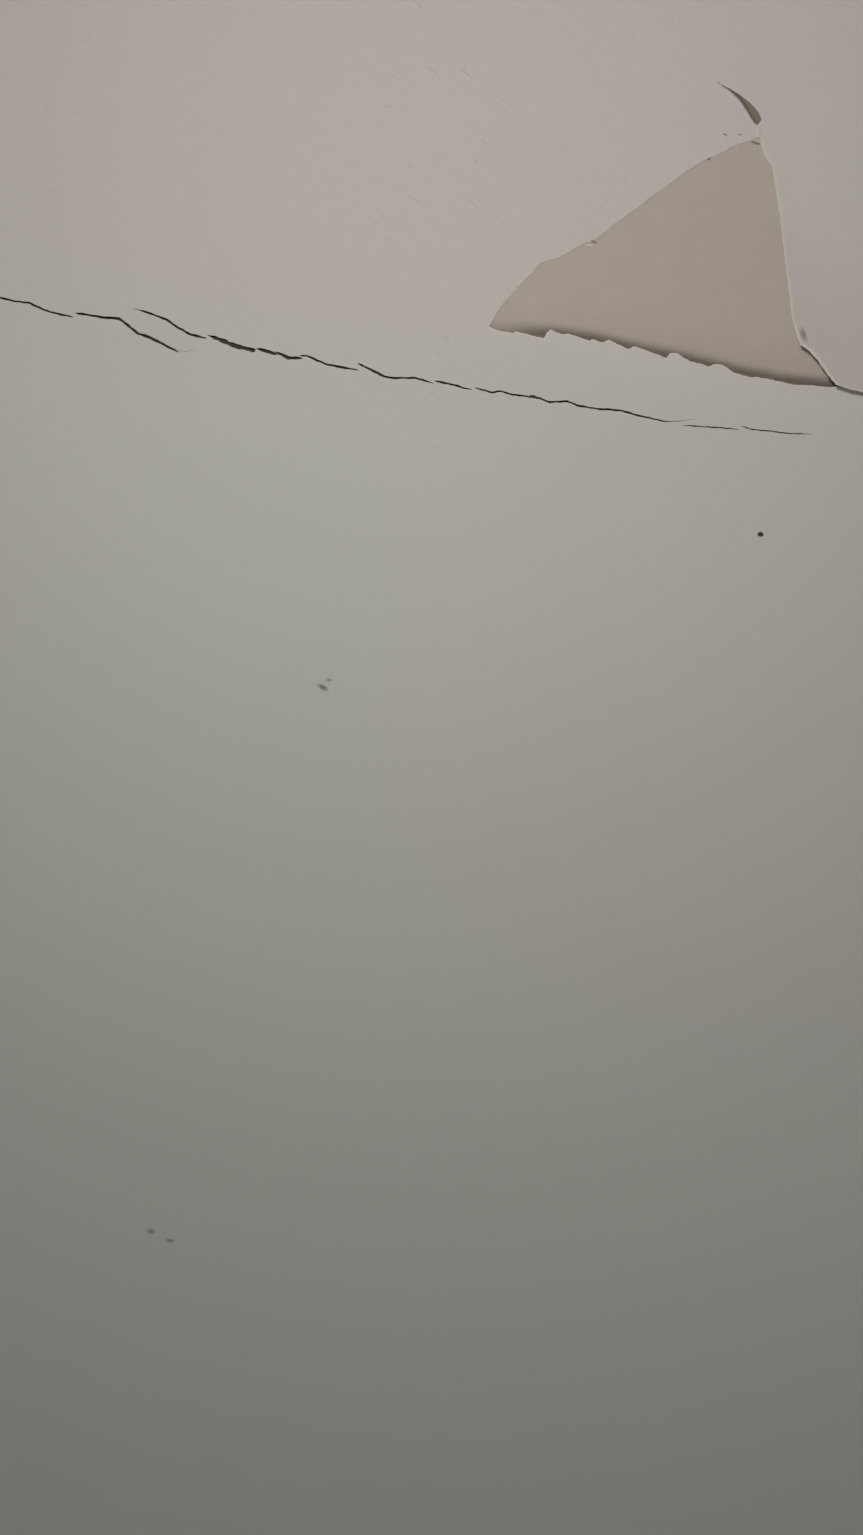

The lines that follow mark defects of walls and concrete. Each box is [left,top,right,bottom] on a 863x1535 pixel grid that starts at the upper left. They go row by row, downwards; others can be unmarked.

crack [0,297,803,434]
peeling [465,127,863,427]